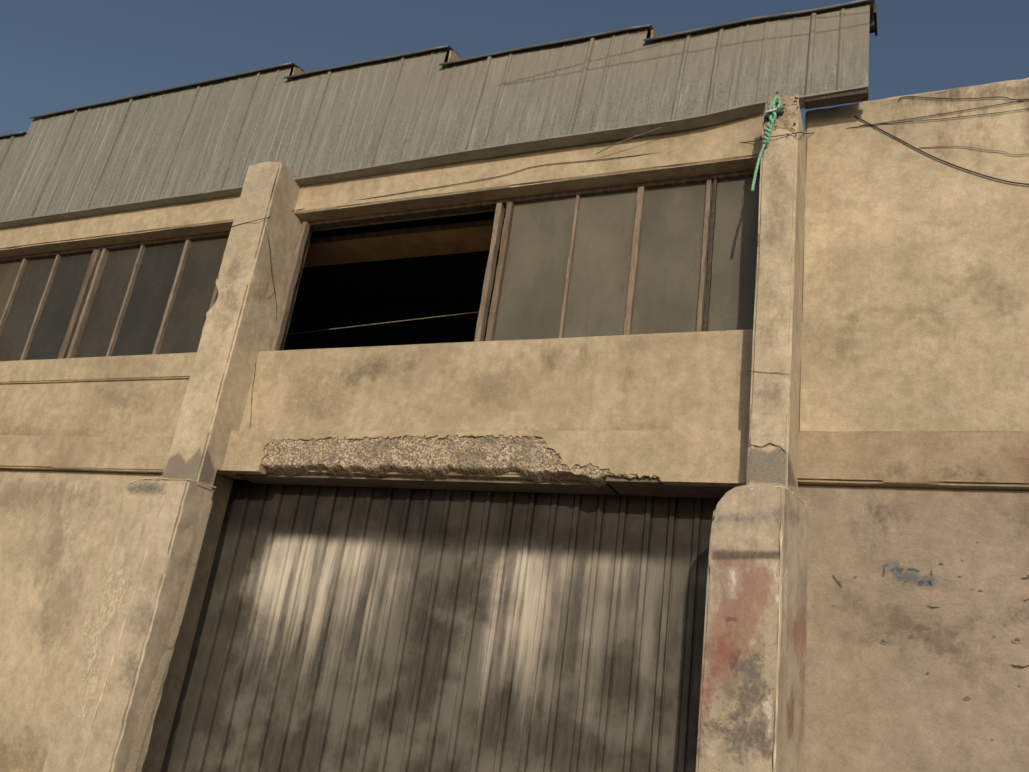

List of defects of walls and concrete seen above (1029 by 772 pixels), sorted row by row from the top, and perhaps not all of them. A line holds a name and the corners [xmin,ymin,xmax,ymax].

spalling [764,91,805,136]
crack [265,228,277,317]
spalling [261,435,639,487]